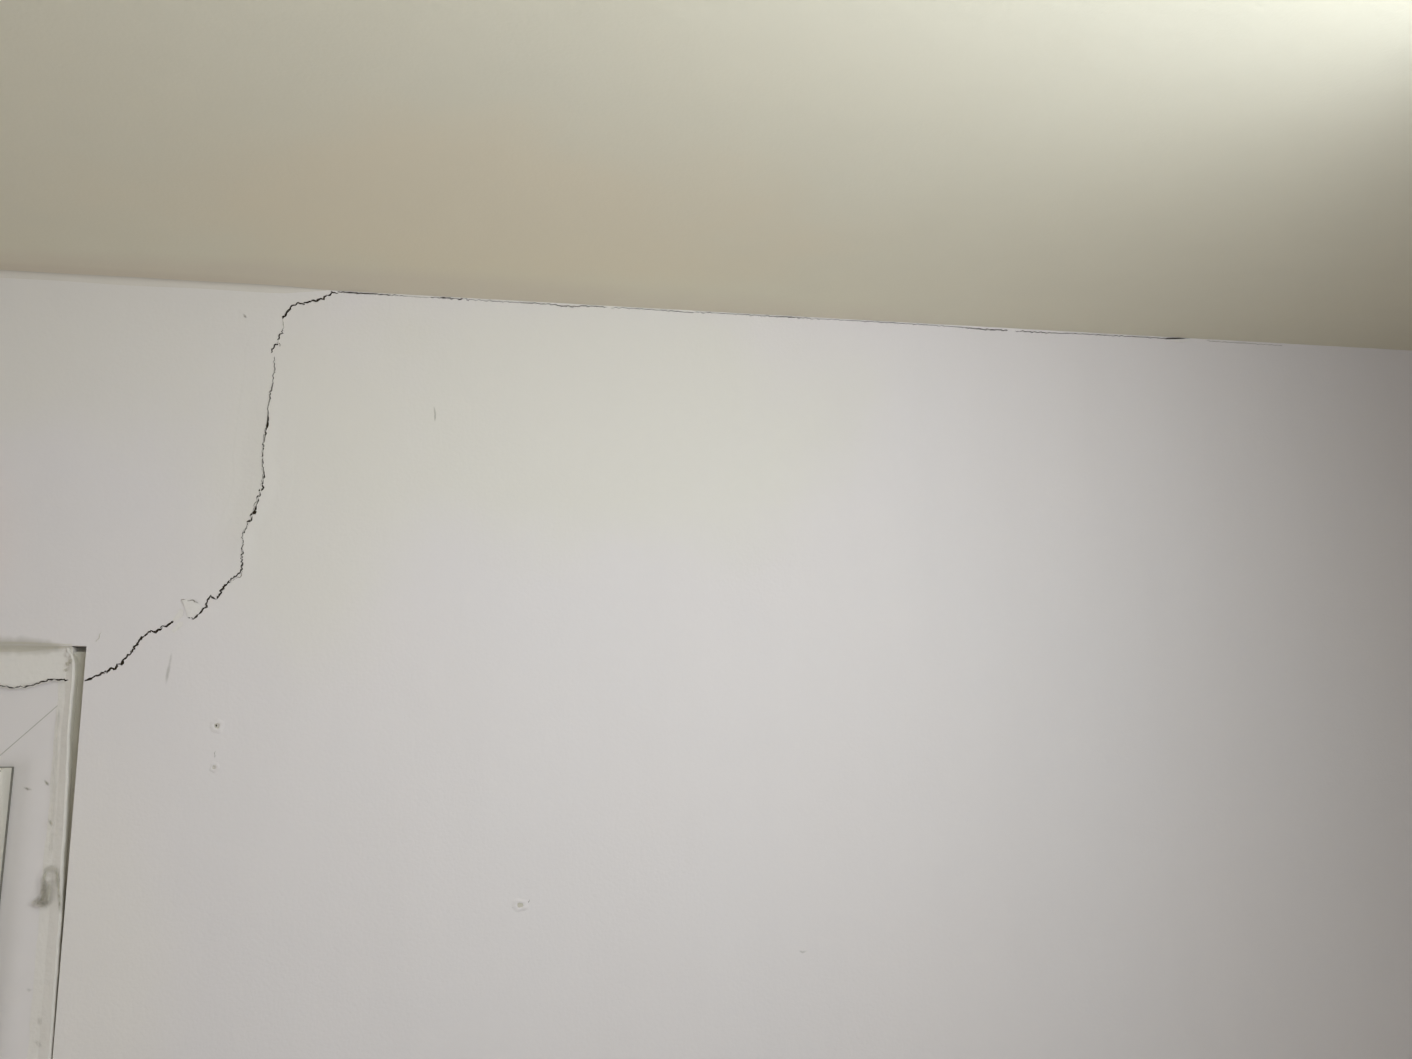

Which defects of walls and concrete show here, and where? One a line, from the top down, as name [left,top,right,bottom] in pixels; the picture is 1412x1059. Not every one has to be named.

crack [0,291,1282,690]